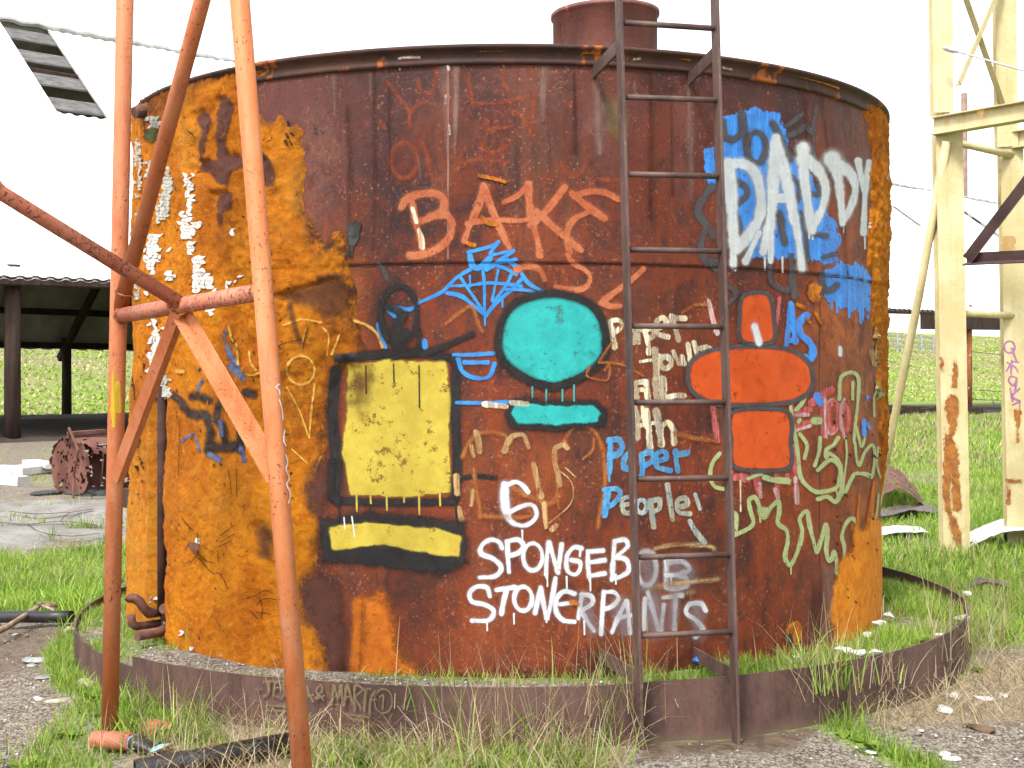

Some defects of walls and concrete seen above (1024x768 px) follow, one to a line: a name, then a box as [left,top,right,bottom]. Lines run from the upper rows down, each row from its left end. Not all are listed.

peeling [132,138,151,198]
peeling [143,97,244,293]
peeling [145,319,164,373]
rust [826,480,883,645]
rust [350,592,419,676]